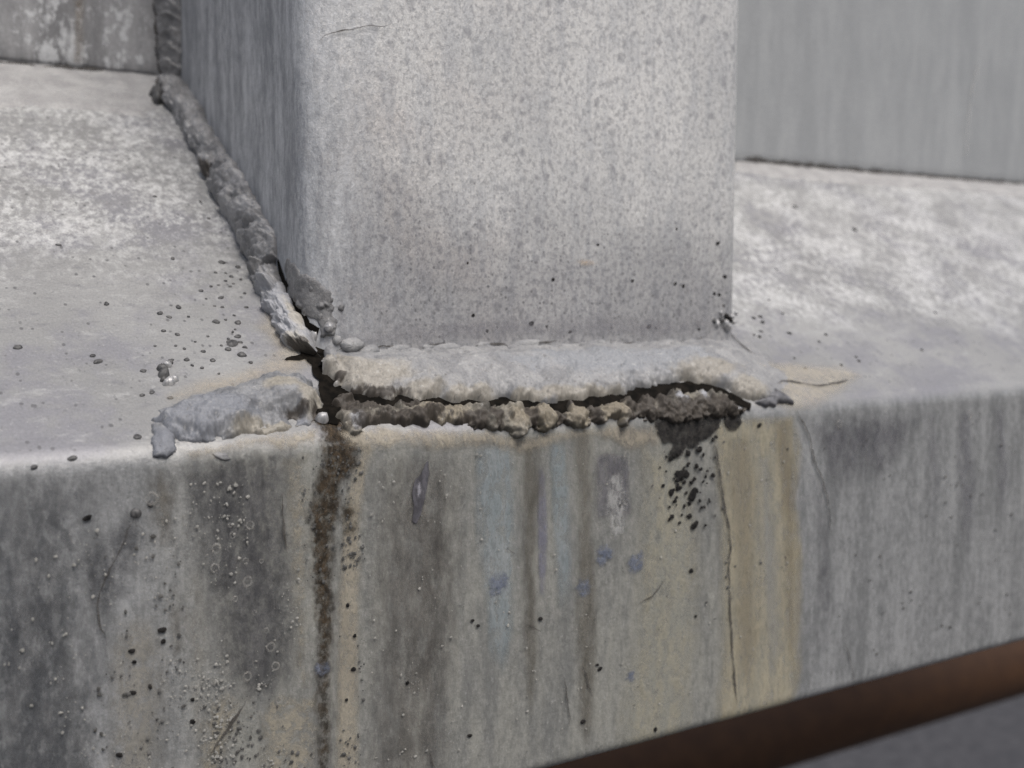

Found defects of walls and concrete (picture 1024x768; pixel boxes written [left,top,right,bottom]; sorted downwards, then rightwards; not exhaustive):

damp [0,509,65,768]
damp [117,629,152,768]
damp [191,462,303,684]
corrosion [310,421,370,768]
damp [388,478,444,768]
damp [347,428,589,654]
crack [277,260,751,425]
damp [598,455,629,512]
damp [626,460,689,747]
peeling [655,413,742,529]
crack [715,445,738,704]
peeling [754,388,794,408]